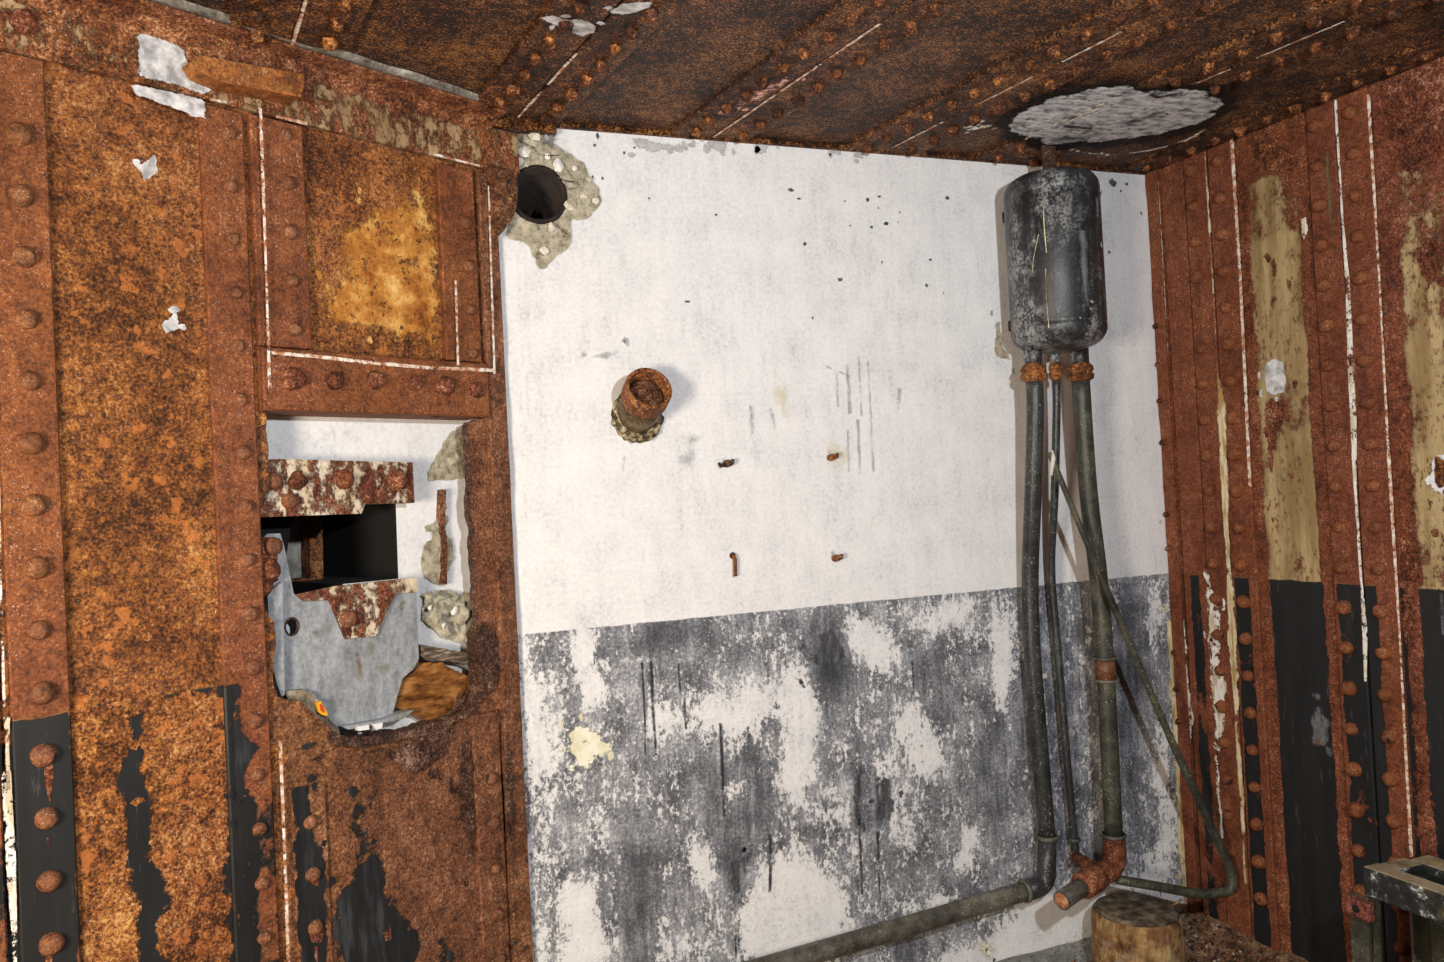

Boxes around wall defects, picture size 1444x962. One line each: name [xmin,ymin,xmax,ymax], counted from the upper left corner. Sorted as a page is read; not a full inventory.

peeling [131,34,211,119]
rust [1380,58,1444,191]
spalling [507,133,603,269]
rust [1411,208,1444,308]
peeling [1258,359,1286,402]
rust [1252,380,1298,482]
spalling [1425,454,1444,496]
spalling [421,425,472,644]
rust [1398,520,1444,839]
rust [371,701,456,780]
peeling [558,713,614,772]
rust [70,686,234,962]